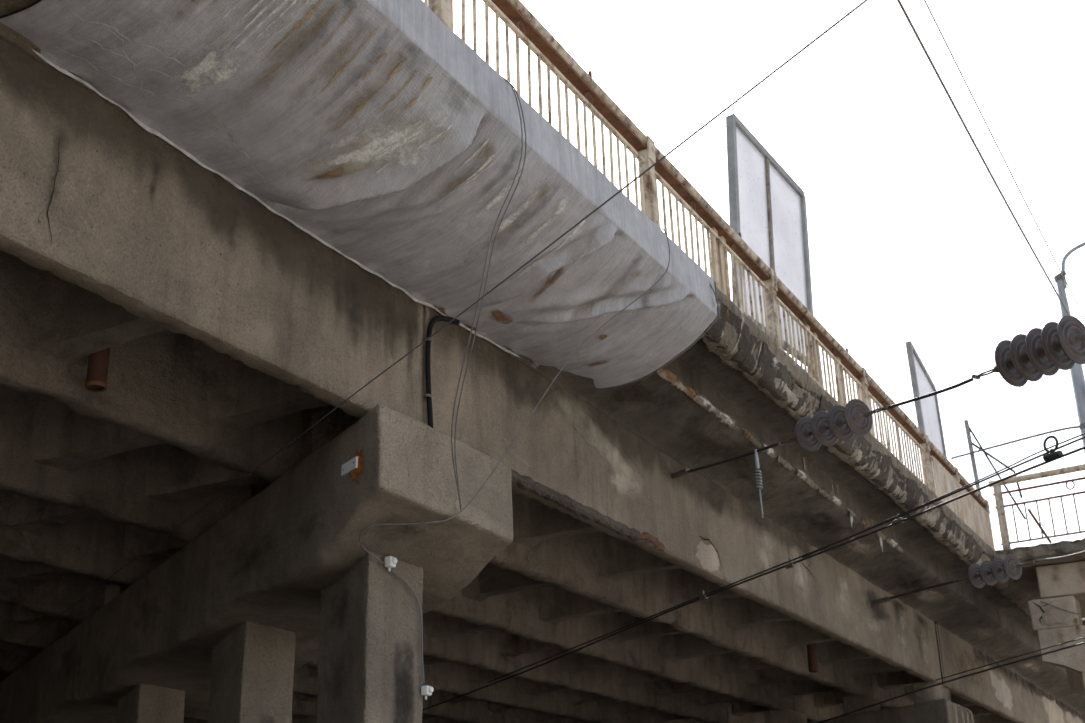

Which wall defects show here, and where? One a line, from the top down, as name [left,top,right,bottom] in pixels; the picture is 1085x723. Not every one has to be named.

damp [54,0,310,107]
crack [38,140,63,248]
damp [0,44,418,355]
damp [313,117,452,179]
damp [497,191,539,232]
corrosion [533,263,572,299]
damp [437,313,664,492]
spalling [700,293,835,421]
spalling [511,470,665,551]
peeling [696,536,721,572]
damp [677,463,809,588]
spalling [692,395,904,553]